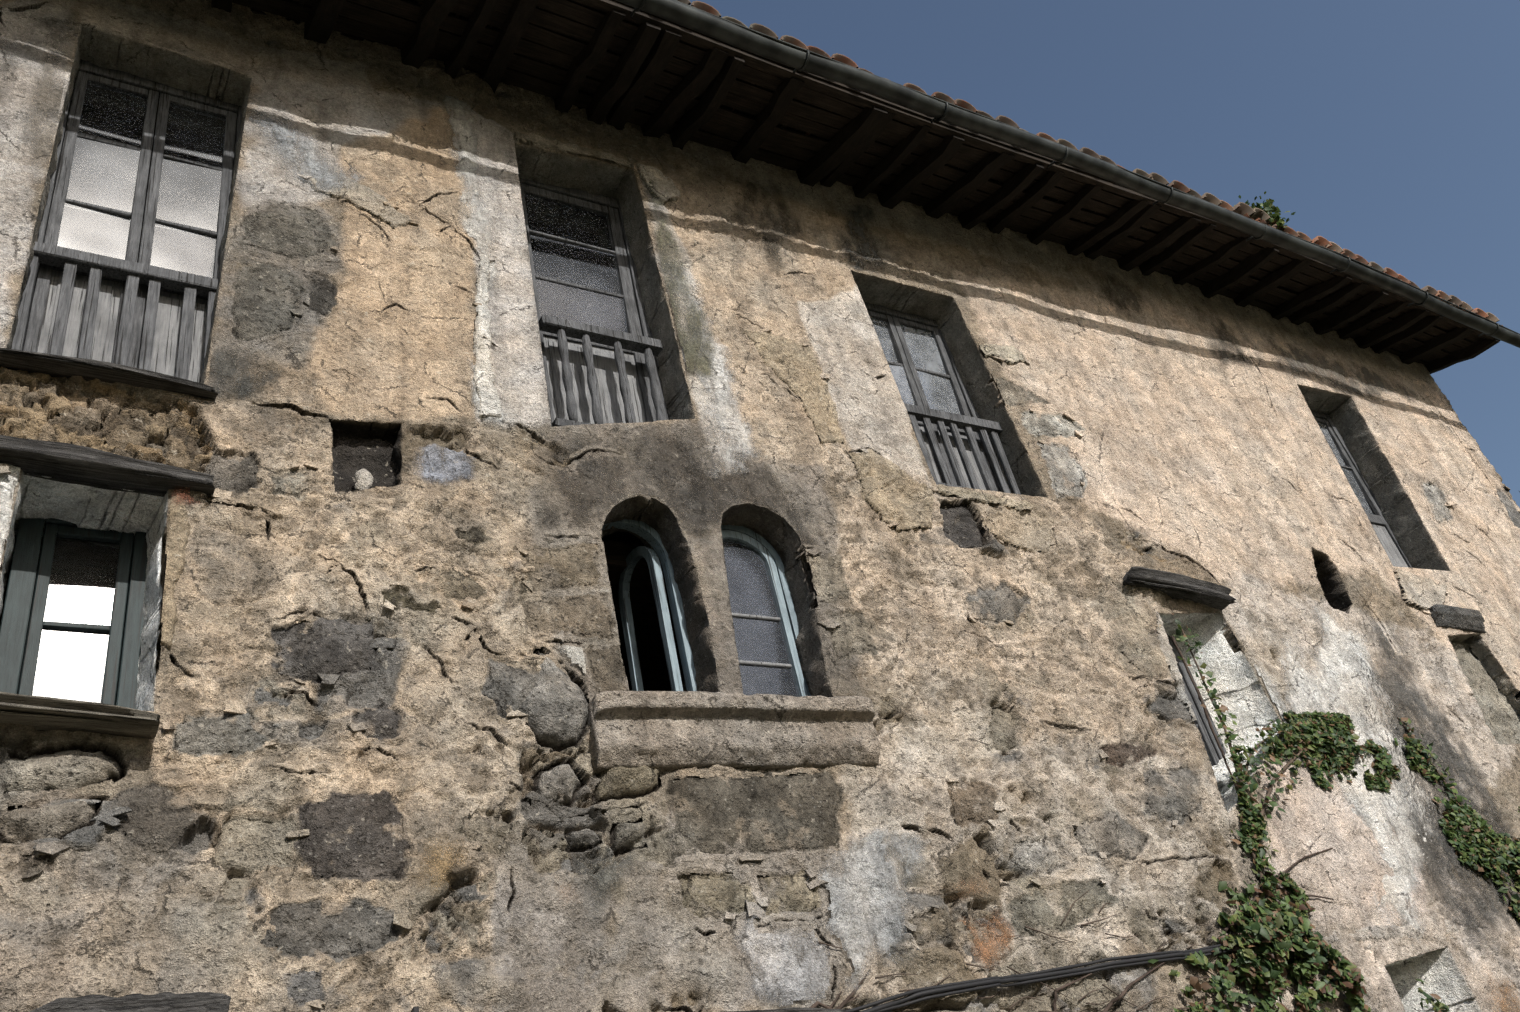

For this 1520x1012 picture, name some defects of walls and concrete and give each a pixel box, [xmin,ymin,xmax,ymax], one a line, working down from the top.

crack [230,238,345,268]
crack [331,189,494,366]
crack [244,365,363,425]
crack [420,393,628,476]
peeling [0,463,20,565]
spalling [263,522,851,932]
spalling [0,702,291,885]